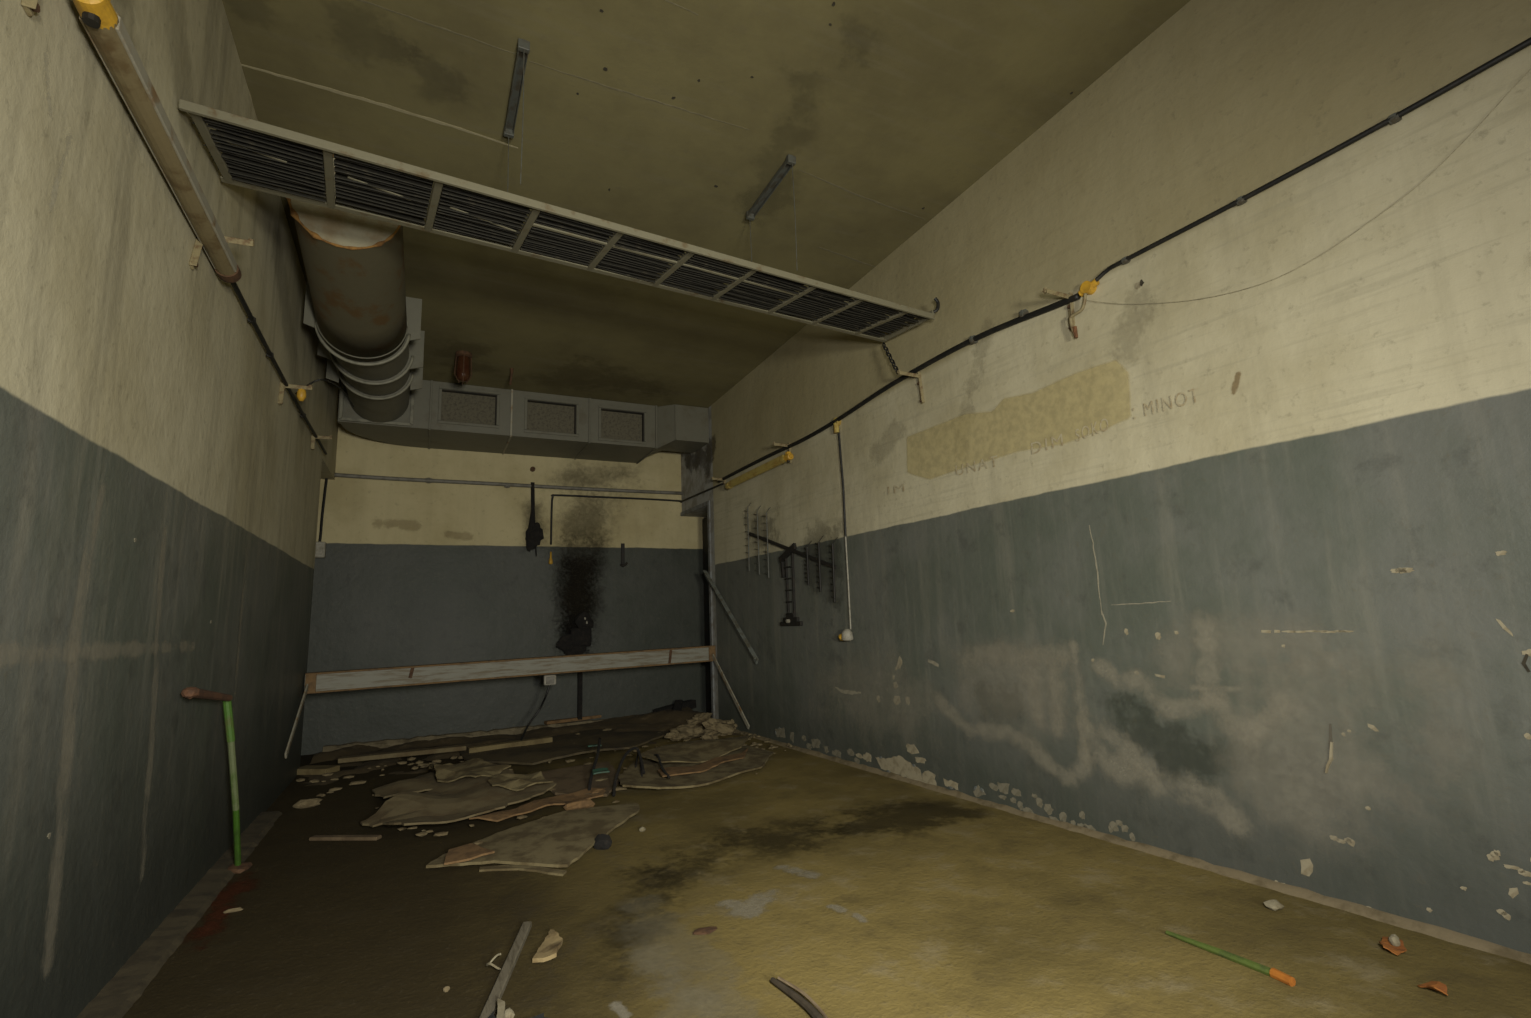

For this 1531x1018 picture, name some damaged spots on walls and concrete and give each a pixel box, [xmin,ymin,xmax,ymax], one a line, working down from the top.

peeling [775,727,1135,841]
peeling [1300,858,1313,876]
peeling [1486,850,1531,920]